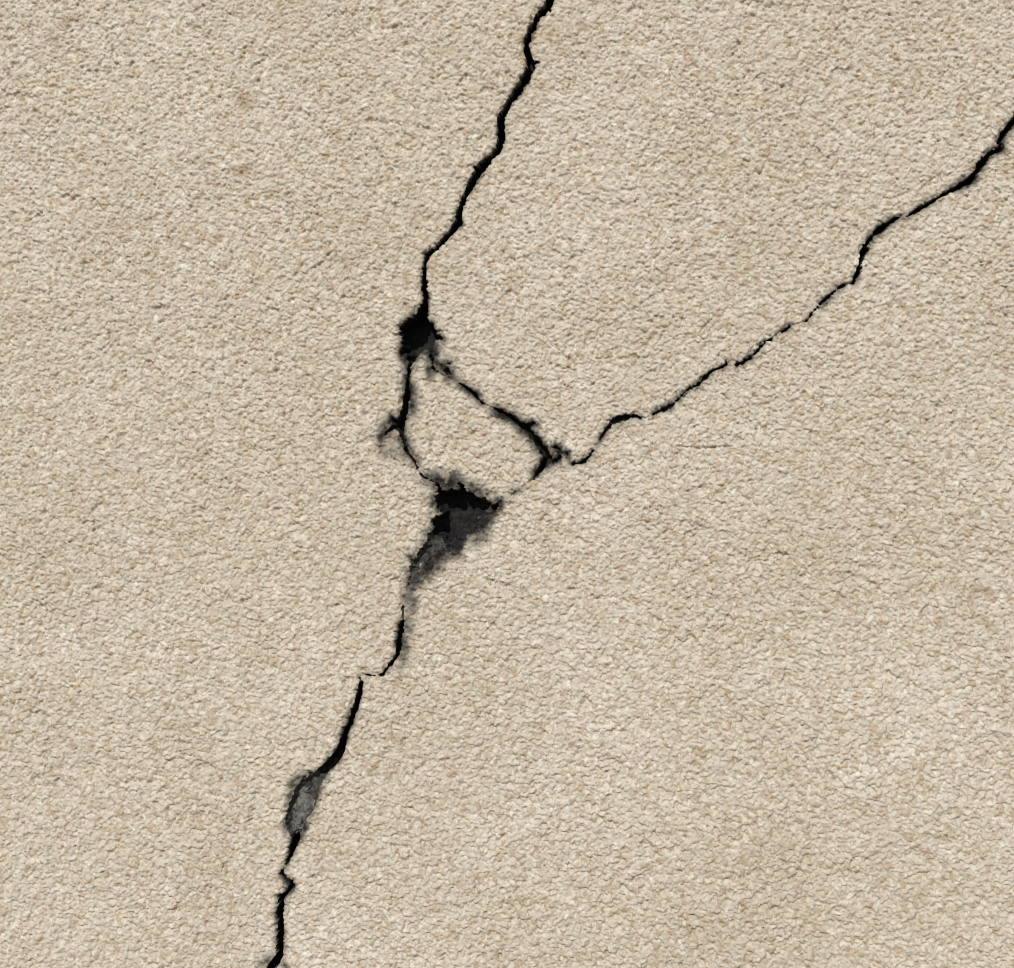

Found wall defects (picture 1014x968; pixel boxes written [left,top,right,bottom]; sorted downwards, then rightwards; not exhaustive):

crack [421,0,554,307]
crack [378,115,1014,512]
crack [317,573,414,770]
crack [267,834,301,968]